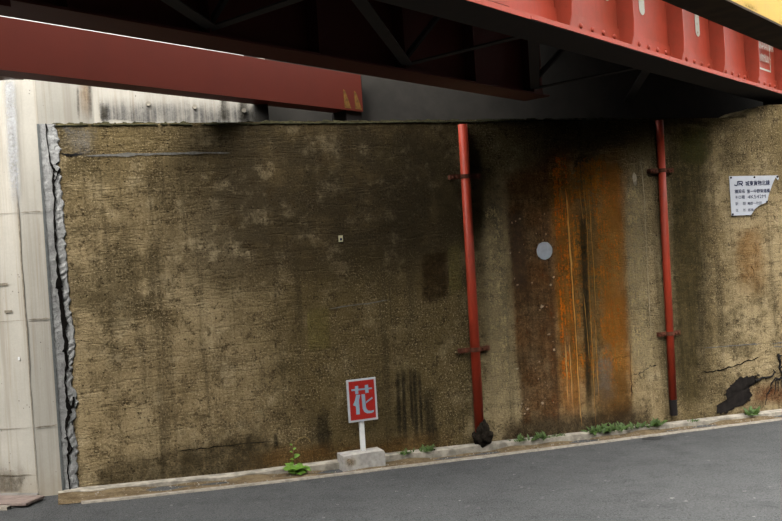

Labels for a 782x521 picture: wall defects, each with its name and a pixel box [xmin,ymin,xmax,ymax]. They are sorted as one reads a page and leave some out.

crack [45,124,82,489]
rust [551,154,578,410]
crack [703,357,758,373]
peeling [717,374,760,414]